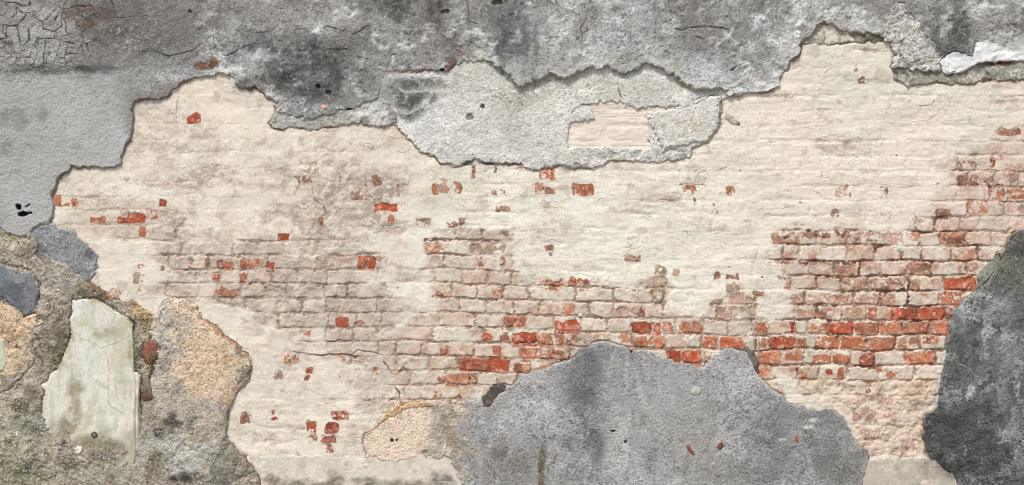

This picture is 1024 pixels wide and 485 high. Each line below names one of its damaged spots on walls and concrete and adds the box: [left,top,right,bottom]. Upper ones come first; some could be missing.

crack [2,1,87,68]
peeling [187,112,201,124]
spalling [270,54,730,196]
spalling [31,222,99,282]
peeling [90,199,167,237]
peeling [188,257,274,297]
peeling [351,175,400,223]
peeling [771,229,920,245]
peeling [956,152,1024,214]
peeling [615,248,1006,411]
spalling [363,303,582,463]
peeling [306,410,349,453]